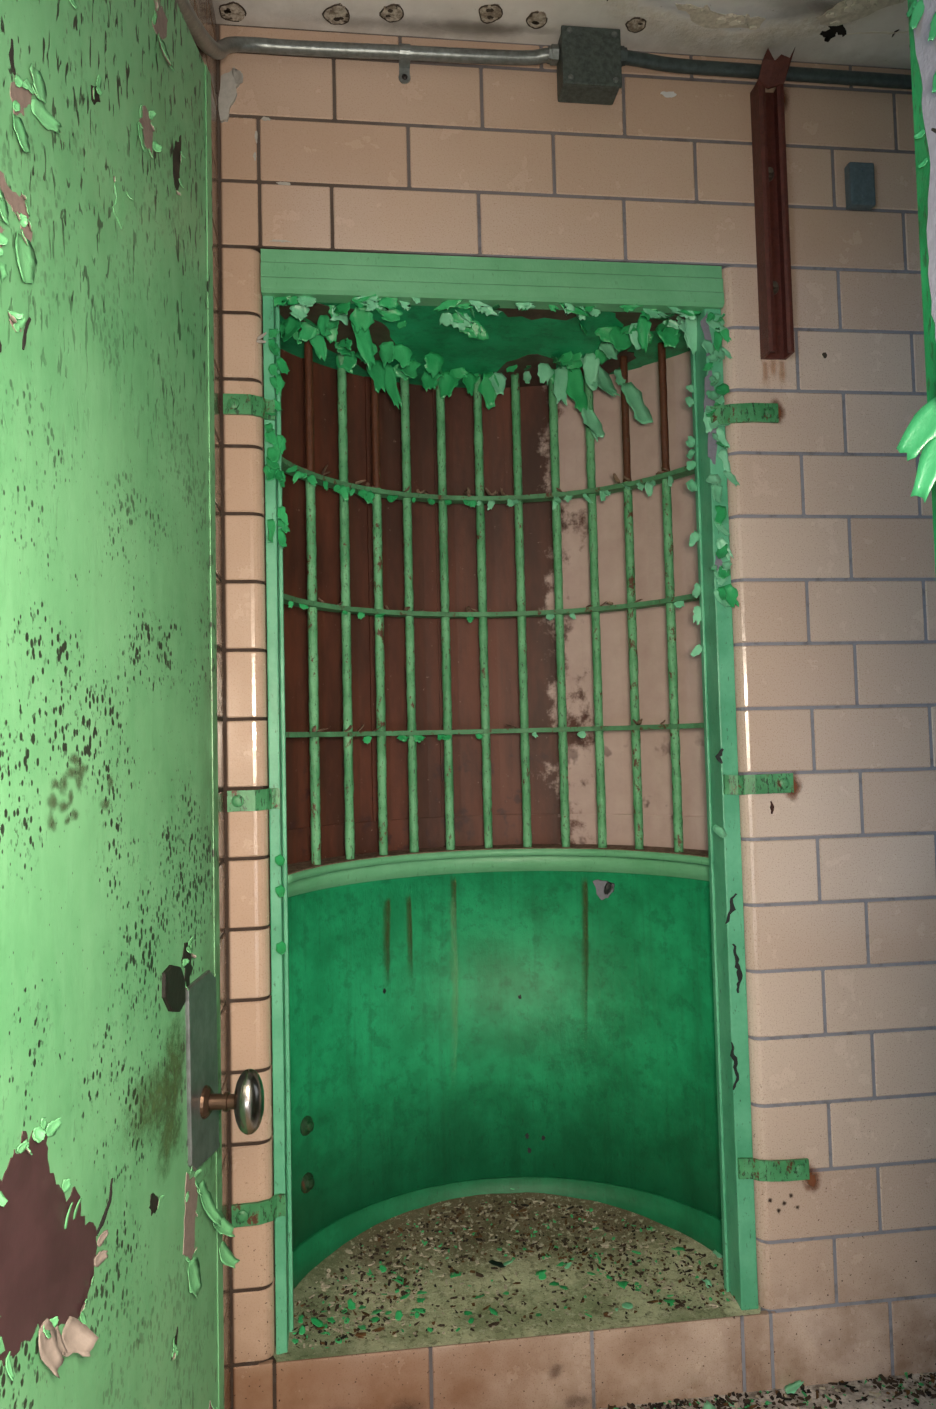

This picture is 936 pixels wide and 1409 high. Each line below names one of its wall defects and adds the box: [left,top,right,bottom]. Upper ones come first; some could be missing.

spalling [675,3,766,30]
peeling [9,39,62,153]
peeling [816,0,936,339]
peeling [0,171,37,285]
peeling [896,397,936,503]
leakage [49,756,86,828]
peeling [0,1117,113,1381]